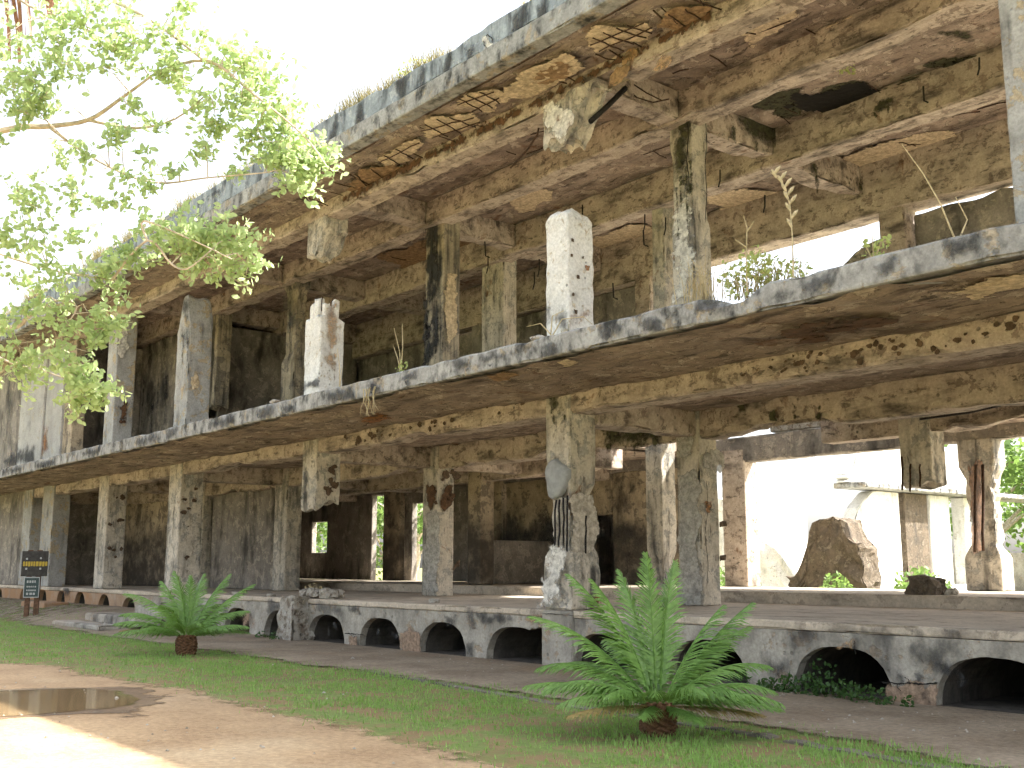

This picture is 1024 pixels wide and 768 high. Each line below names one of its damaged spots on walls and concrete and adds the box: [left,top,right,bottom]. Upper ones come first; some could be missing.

spalling [585,0,722,124]
peeling [752,87,803,124]
spalling [301,53,586,209]
leakage [943,233,972,256]
leakage [881,257,893,273]
leakage [800,274,830,294]
leakage [402,225,444,384]
leakage [695,299,718,315]
leakage [642,318,661,332]
peeling [323,465,339,496]
rust [426,484,456,512]
spalling [526,492,600,633]